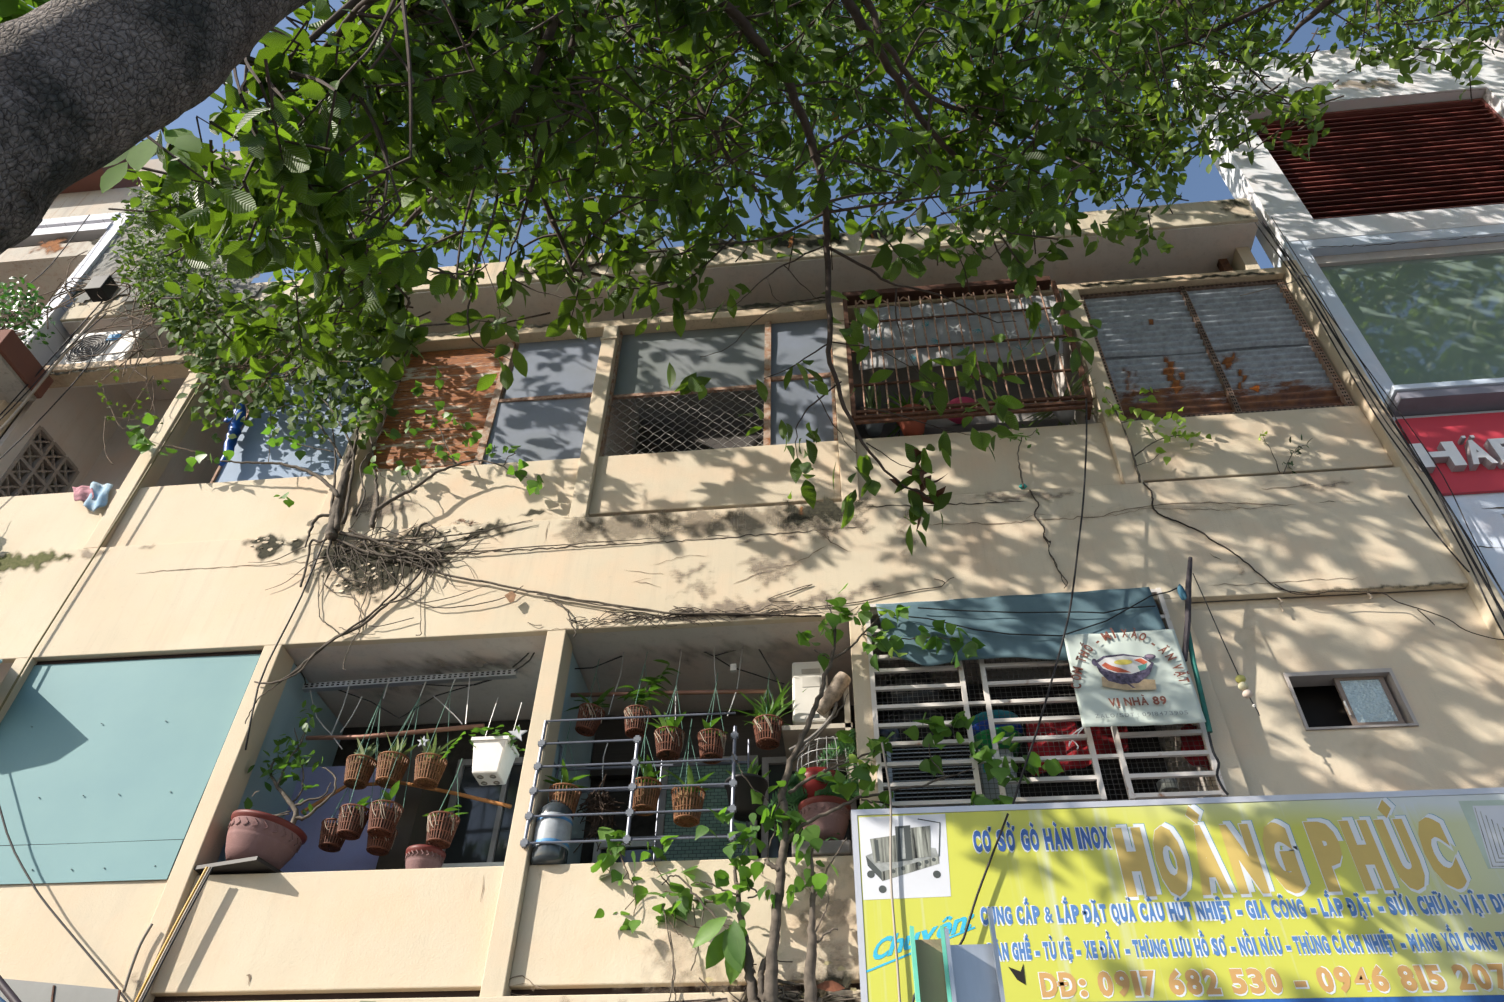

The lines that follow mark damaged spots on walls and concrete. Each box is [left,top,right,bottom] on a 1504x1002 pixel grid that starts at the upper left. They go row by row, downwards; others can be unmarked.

corrosion [1163,357,1185,394]
corrosion [1222,352,1260,392]
damp [561,496,878,621]
crack [453,482,1357,587]